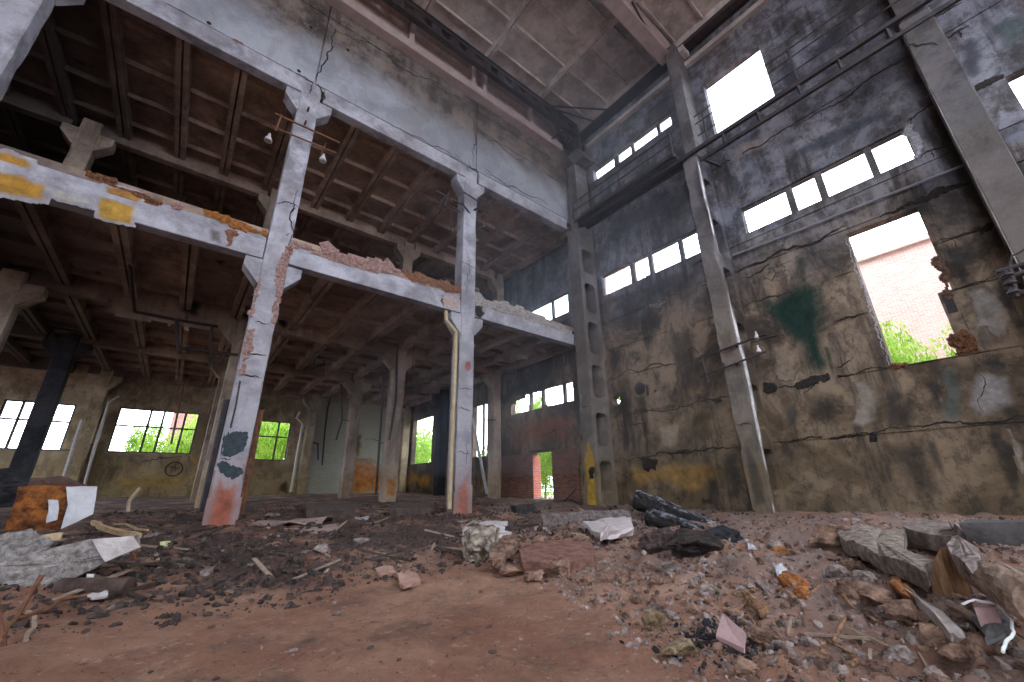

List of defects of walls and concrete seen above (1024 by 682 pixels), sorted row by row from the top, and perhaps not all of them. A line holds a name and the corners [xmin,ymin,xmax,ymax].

crack [289,25,561,205]
rust [94,183,144,227]
rust [225,229,239,246]
spalling [271,240,461,324]
spalling [475,291,566,332]
crack [738,225,844,305]
spalling [930,256,954,300]
spalling [946,329,982,356]
damp [626,261,775,513]
damp [765,259,1024,506]
crack [776,372,1024,444]
rust [201,463,243,526]